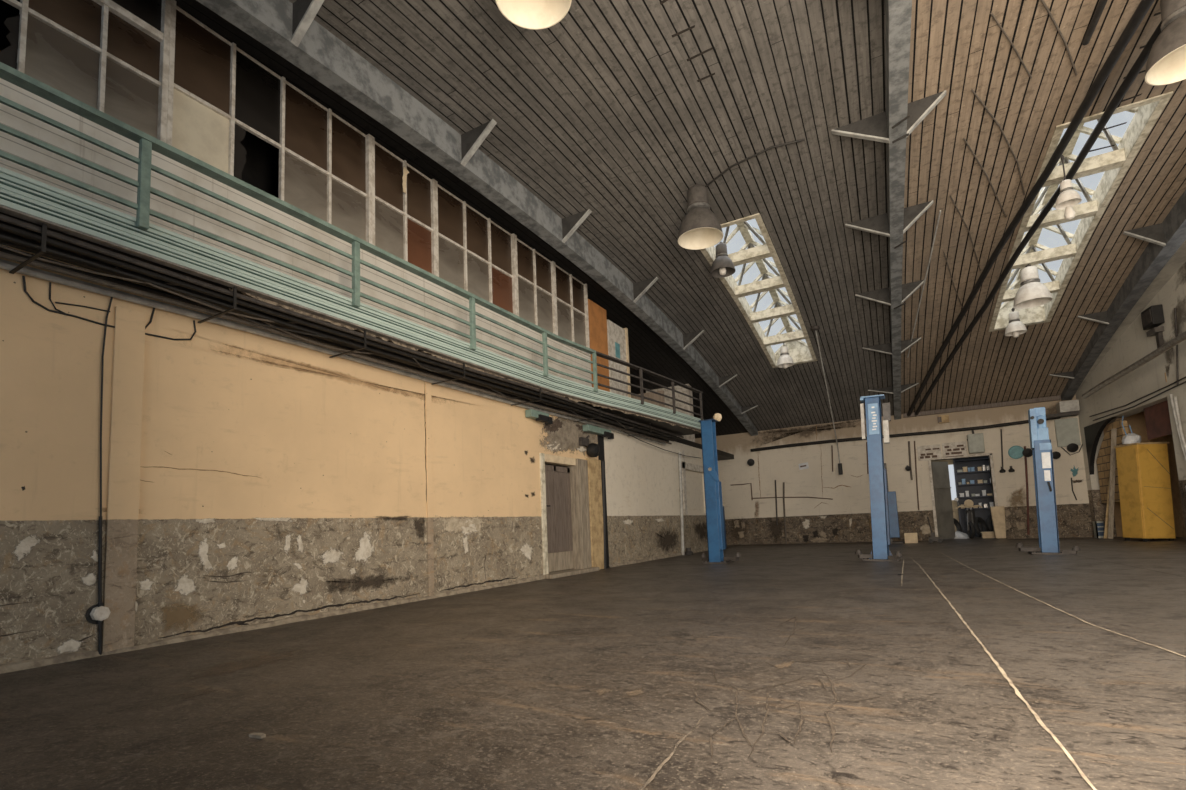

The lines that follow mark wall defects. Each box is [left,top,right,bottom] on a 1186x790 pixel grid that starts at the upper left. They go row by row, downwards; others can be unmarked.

peeling [12,534,41,561]
crack [0,601,38,637]